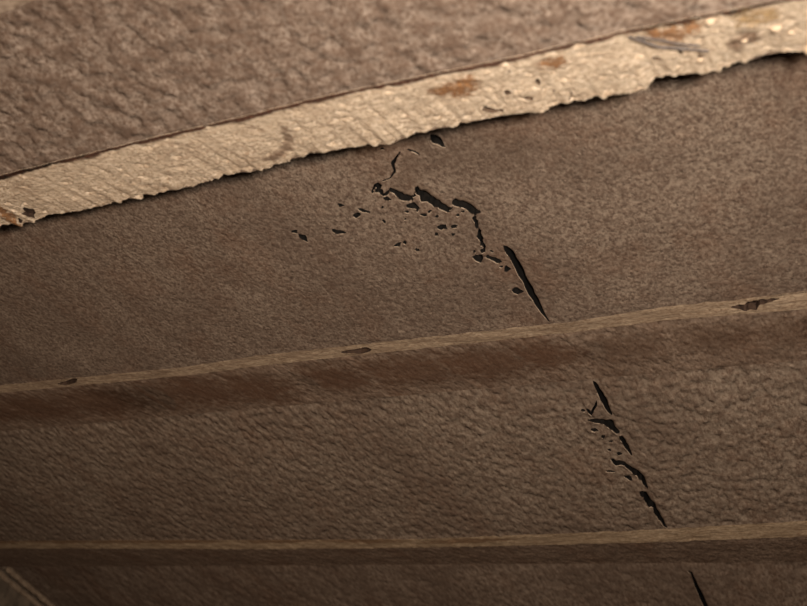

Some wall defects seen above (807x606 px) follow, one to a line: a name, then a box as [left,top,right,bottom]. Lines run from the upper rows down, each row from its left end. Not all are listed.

rust [0,0,796,179]
spalling [0,0,807,227]
rust [0,207,21,226]
crack [291,230,308,242]
crack [332,134,549,321]
crack [581,381,668,529]
crack [688,571,709,606]